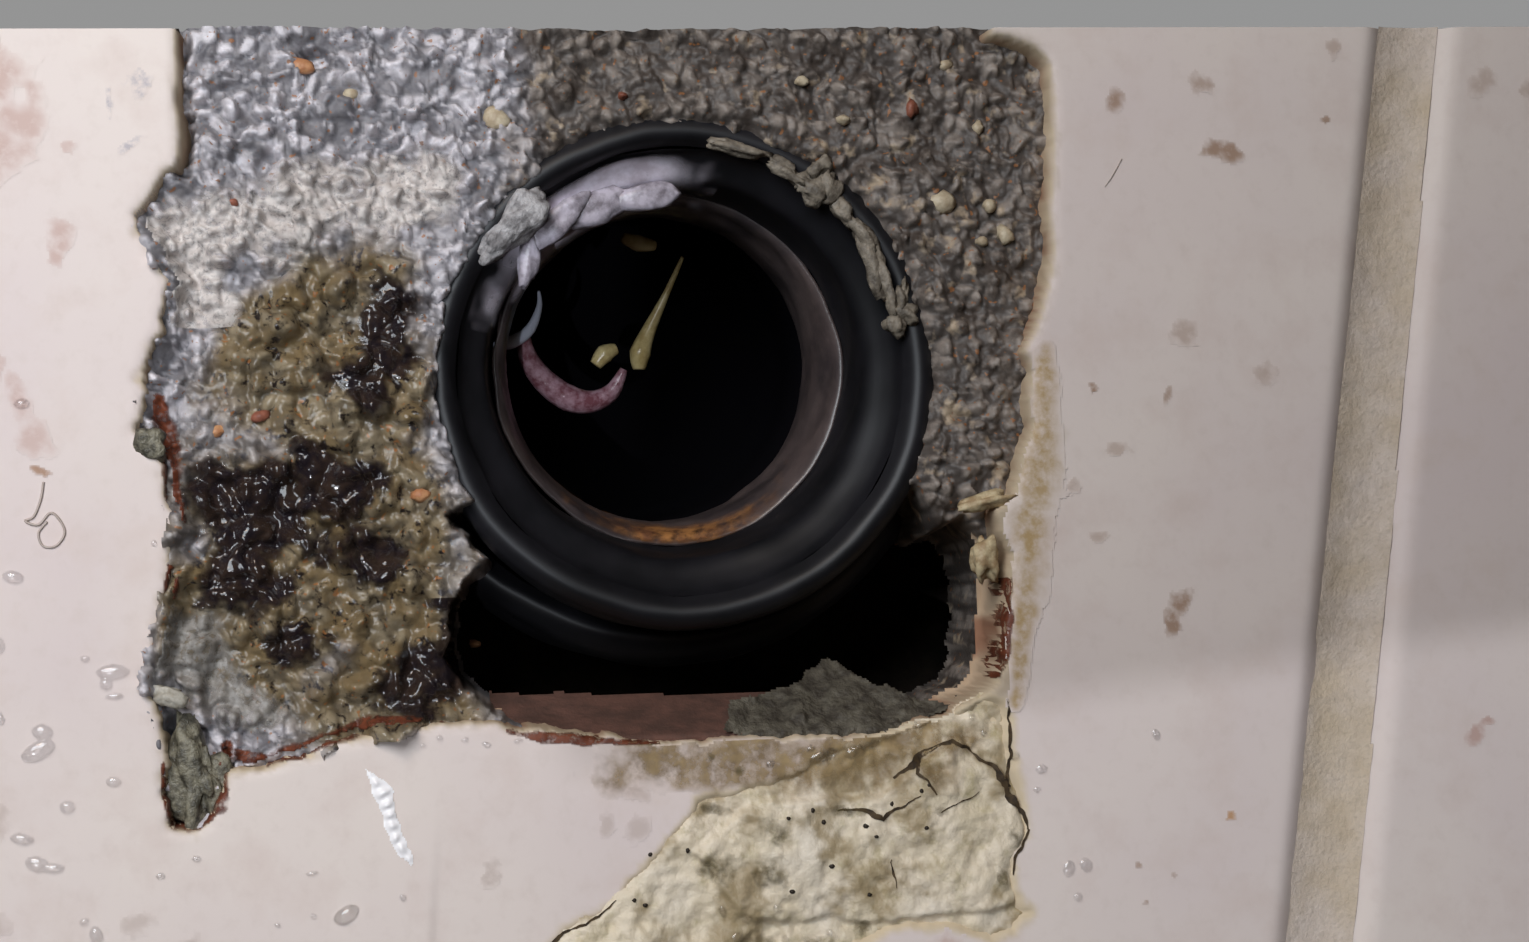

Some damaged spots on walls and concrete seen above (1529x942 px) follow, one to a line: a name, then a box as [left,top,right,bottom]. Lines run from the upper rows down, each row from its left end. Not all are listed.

damp [1467,65,1498,100]
damp [321,268,429,416]
corrosion [152,394,187,523]
spalling [131,26,1046,942]
corrosion [163,564,179,599]
damp [156,435,408,732]
damp [372,598,466,722]
corrosion [983,577,1015,678]
corrosion [161,716,444,830]
corrosion [506,729,660,746]
crack [840,701,1030,875]